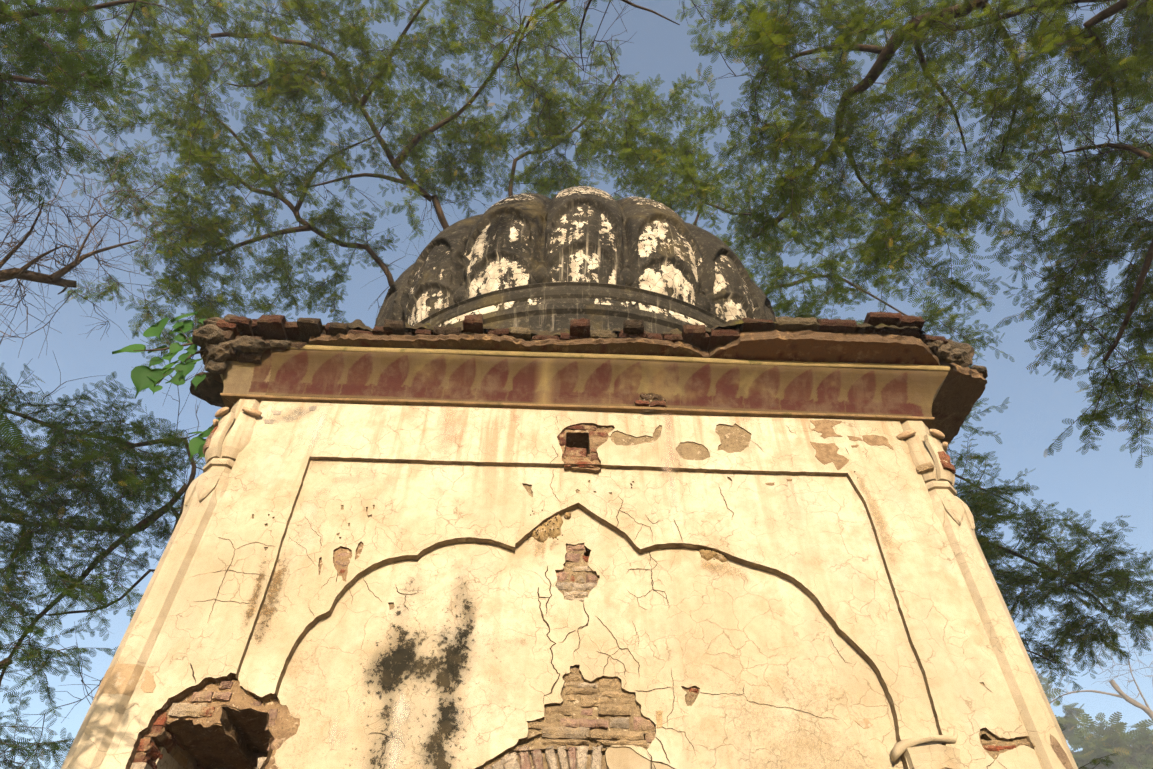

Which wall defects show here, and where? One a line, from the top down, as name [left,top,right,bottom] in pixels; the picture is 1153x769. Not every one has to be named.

peeling [406,192,543,326]
peeling [550,186,756,326]
spalling [557,423,662,495]
flaking render [676,423,751,460]
flaking render [810,419,893,470]
crack [197,517,416,623]
flaking render [555,543,600,603]
spalling [125,672,300,769]
leakage [364,577,476,769]
flaking render [509,665,663,754]
crack [537,496,837,769]
flaking render [979,727,1035,760]